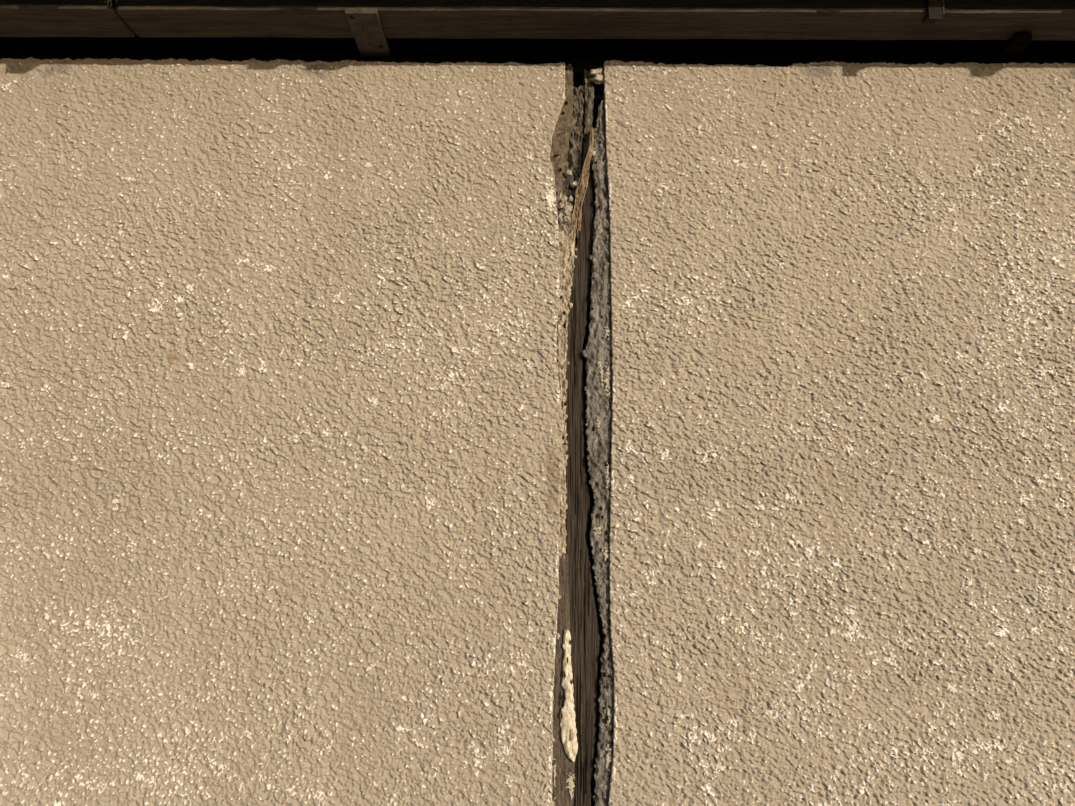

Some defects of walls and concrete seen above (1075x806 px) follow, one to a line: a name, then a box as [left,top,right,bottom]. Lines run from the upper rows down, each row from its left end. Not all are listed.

crack [575,538,589,617]
crack [577,685,587,804]